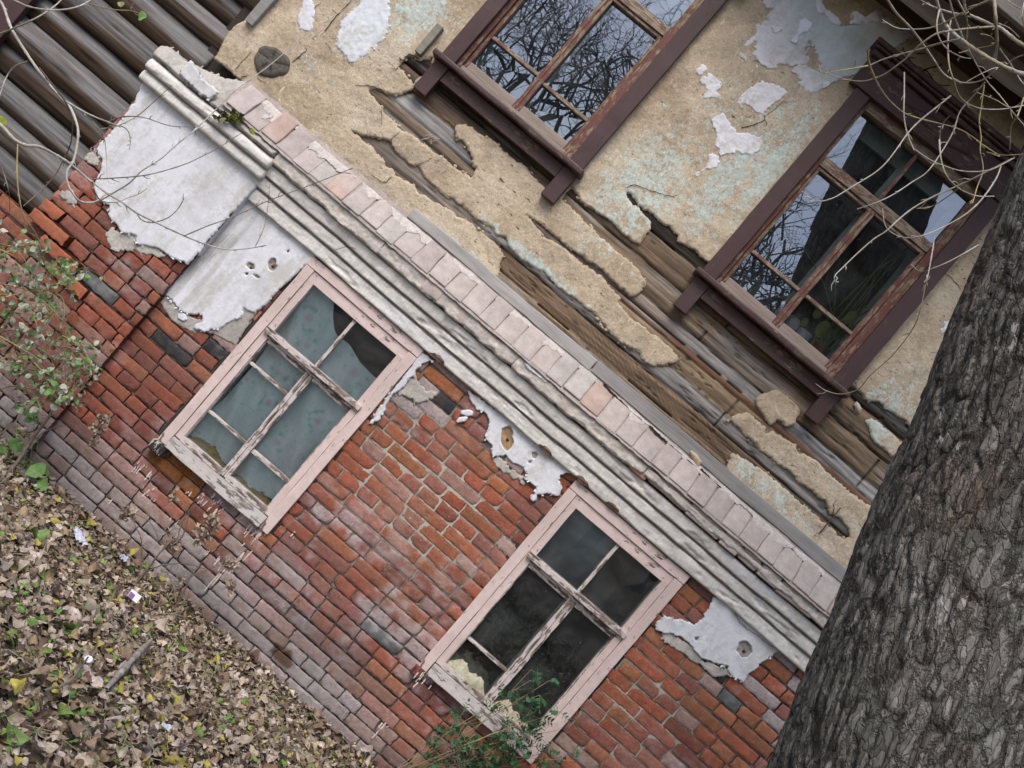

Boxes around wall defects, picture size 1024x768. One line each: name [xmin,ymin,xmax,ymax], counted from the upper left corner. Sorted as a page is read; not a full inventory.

flaking render [179,60,220,101]
peeling [335,0,391,63]
flaking render [369,57,554,188]
peeling [695,64,722,100]
peeling [694,113,763,178]
peeling [737,0,915,115]
flaking render [92,83,316,333]
flaking render [272,133,909,628]
flaking render [655,596,779,683]